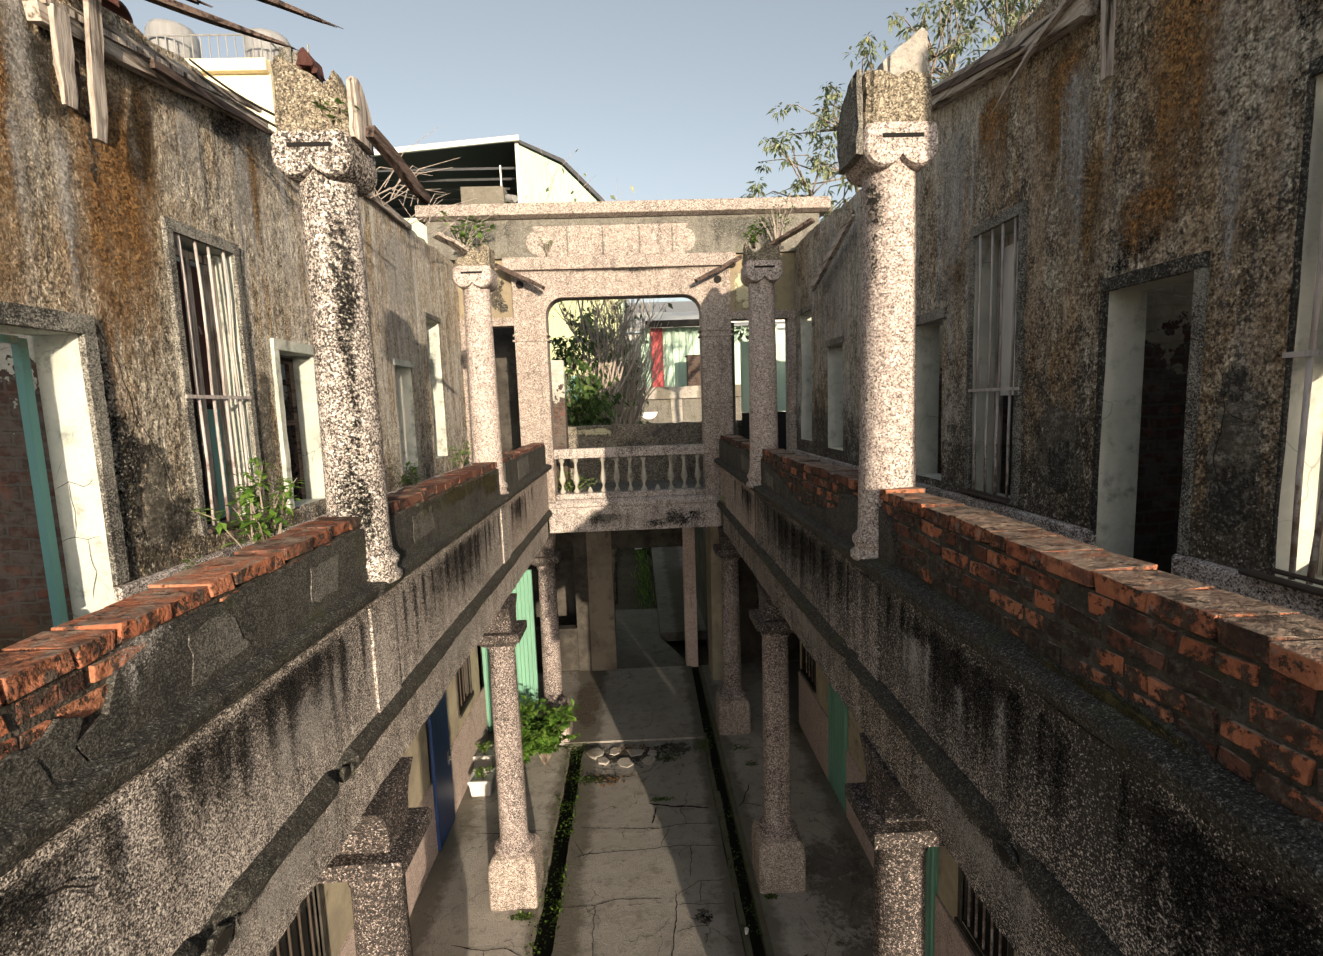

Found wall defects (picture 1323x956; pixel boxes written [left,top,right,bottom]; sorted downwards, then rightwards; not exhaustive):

water stain [1,0,33,238]
water stain [52,130,76,281]
water stain [1059,74,1089,214]
water stain [1108,218,1161,276]
water stain [116,624,171,696]
water stain [150,622,369,924]
water stain [885,596,1072,872]
water stain [0,810,130,956]
water stain [225,800,339,956]
crack [451,945,519,956]
water stain [921,762,1051,954]
water stain [1108,772,1323,956]